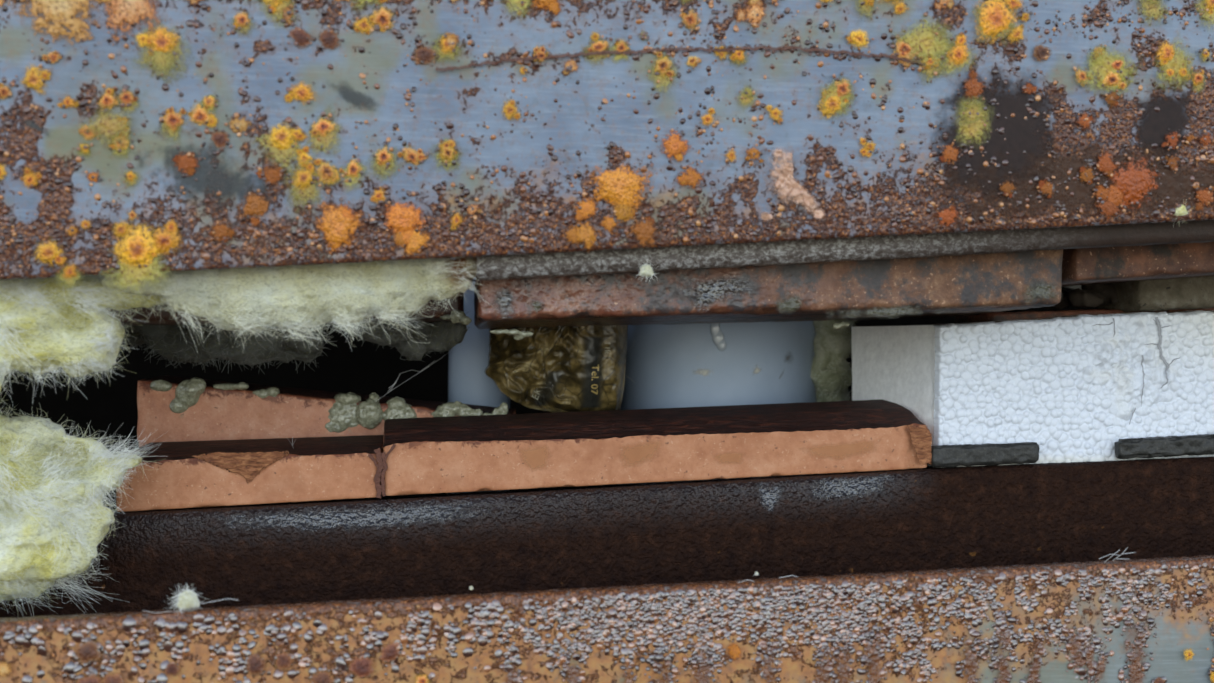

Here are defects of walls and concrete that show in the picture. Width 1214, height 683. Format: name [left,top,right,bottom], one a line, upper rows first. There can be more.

rust [0,0,1214,290]
crack [1129,317,1179,424]
rust [0,563,1214,683]